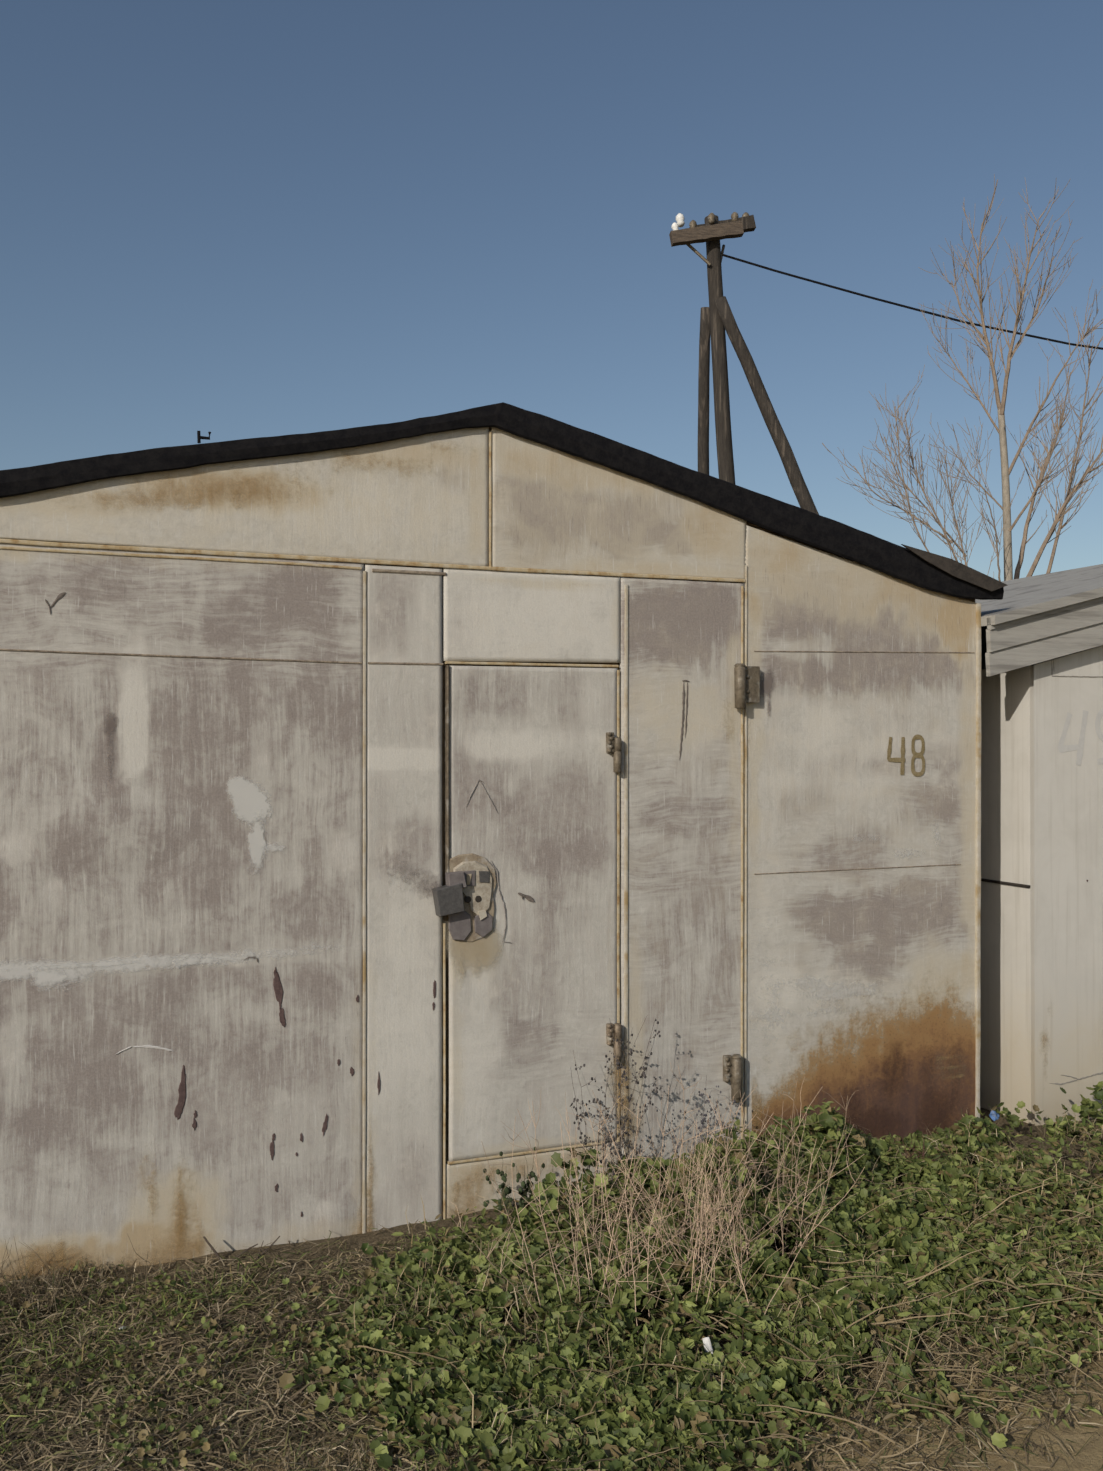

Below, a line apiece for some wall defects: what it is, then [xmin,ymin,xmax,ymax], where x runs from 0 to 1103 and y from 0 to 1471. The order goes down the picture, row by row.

peeling [227,776,283,870]
rust [752,997,976,1145]